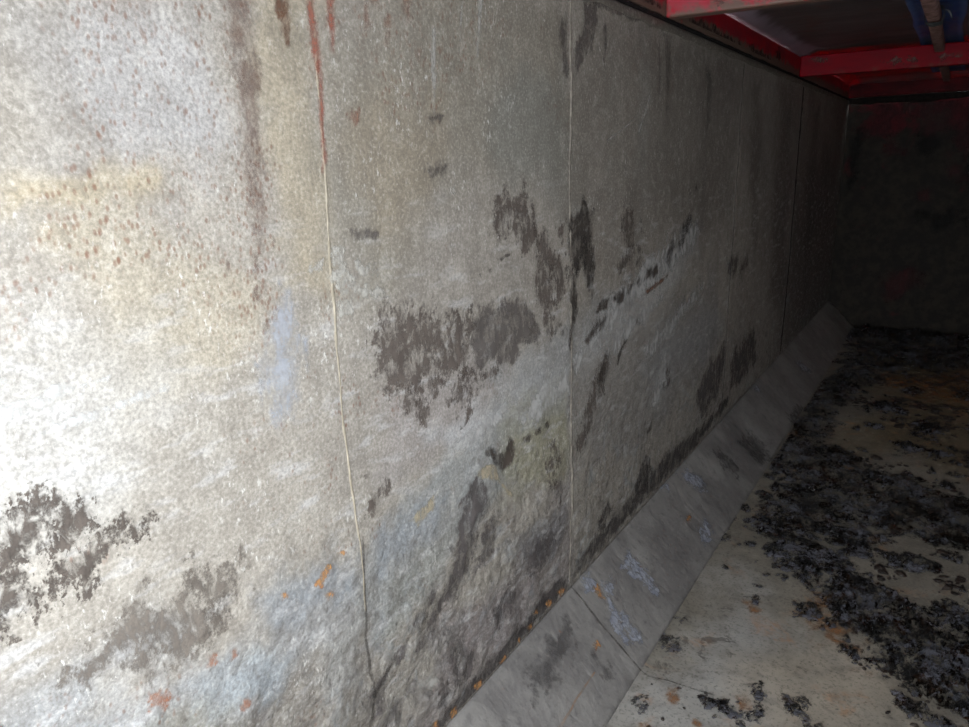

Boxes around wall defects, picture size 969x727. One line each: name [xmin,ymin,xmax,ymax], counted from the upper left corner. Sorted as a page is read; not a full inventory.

leakage [366,184,660,453]
leakage [697,328,756,418]
corrosion [314,564,333,597]